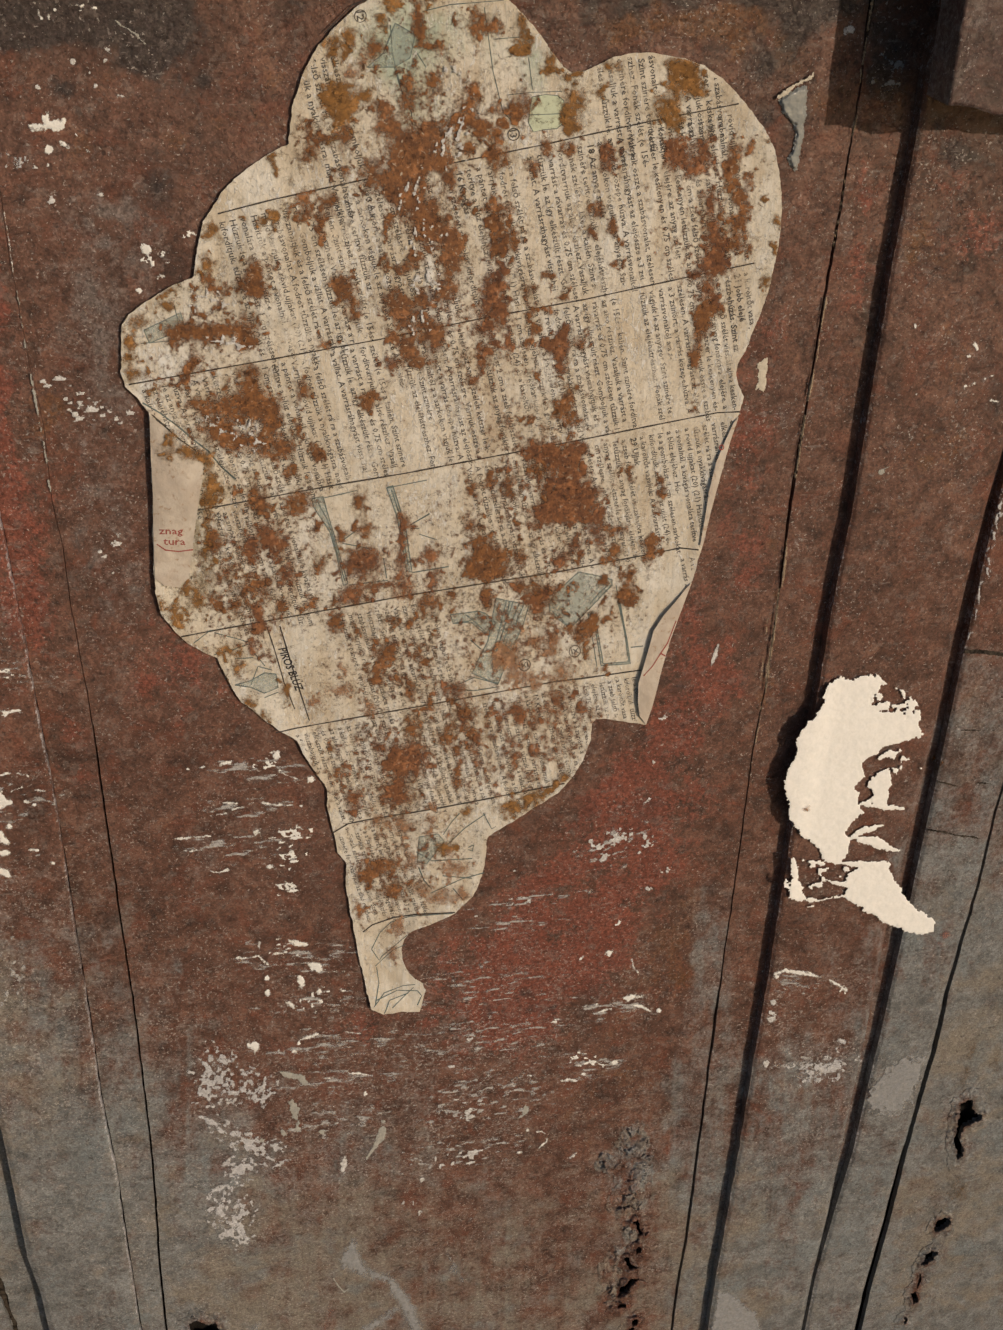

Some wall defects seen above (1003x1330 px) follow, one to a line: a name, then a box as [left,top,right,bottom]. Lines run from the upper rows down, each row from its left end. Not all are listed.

corrosion [647,58,770,412]
corrosion [769,215,781,255]
corrosion [122,0,665,964]
corrosion [652,472,668,516]
crack [964,648,1003,656]
crack [928,829,978,839]
crack [0,1277,18,1330]
corrosion [592,1117,655,1304]
crack [854,996,944,1330]
crack [893,1209,963,1330]